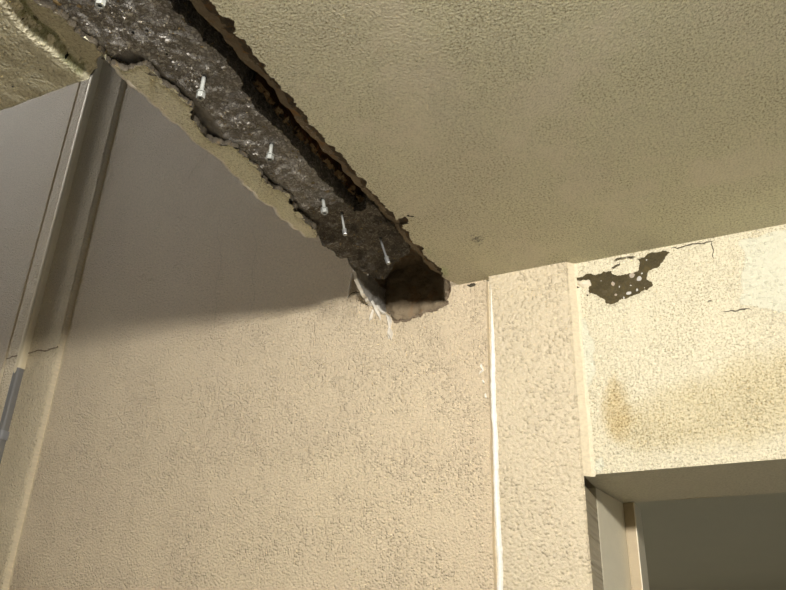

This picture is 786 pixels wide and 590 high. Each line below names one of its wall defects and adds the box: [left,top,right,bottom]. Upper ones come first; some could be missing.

spalling [34,0,451,341]
spalling [575,249,672,306]
crack [672,241,714,257]